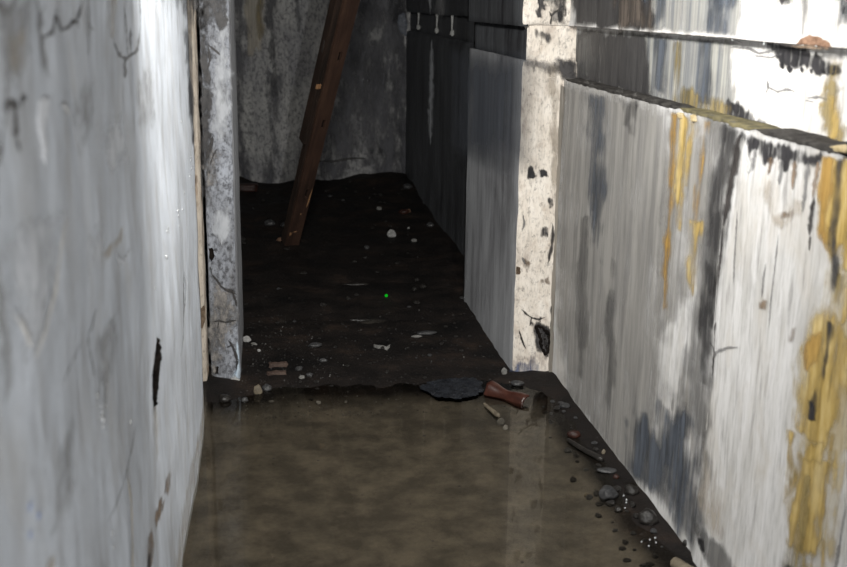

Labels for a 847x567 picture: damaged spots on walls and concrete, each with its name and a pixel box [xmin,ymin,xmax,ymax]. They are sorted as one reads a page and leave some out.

crack [36,0,94,78]
crack [114,4,141,77]
crack [538,1,847,50]
crack [0,62,26,153]
corrosion [819,65,844,142]
damp [830,144,847,153]
corrosion [659,112,709,330]
damp [558,0,743,567]
corrosion [785,157,847,567]